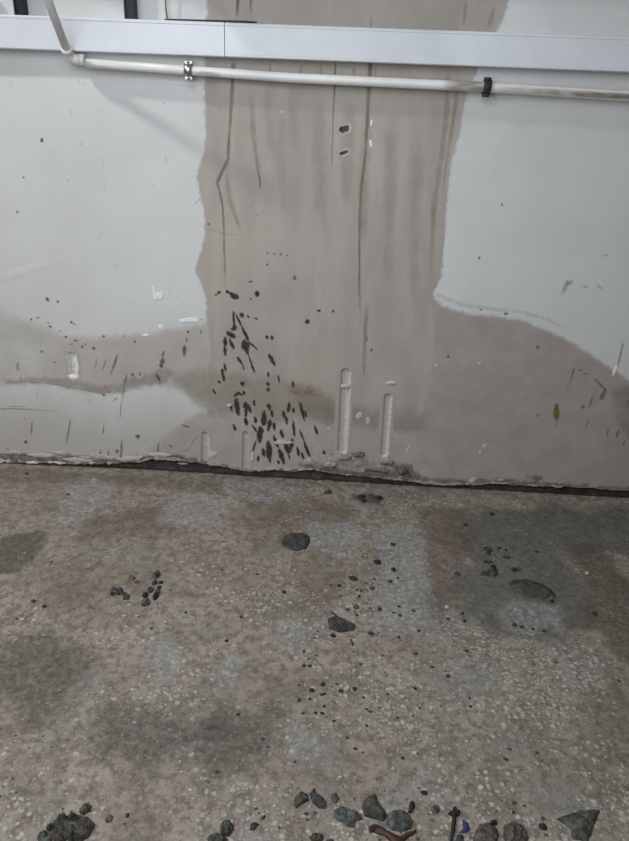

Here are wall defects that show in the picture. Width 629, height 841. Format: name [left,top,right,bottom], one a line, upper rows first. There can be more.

leakage [206,0,508,32]
leakage [52,57,629,491]
flaking render [0,439,564,488]